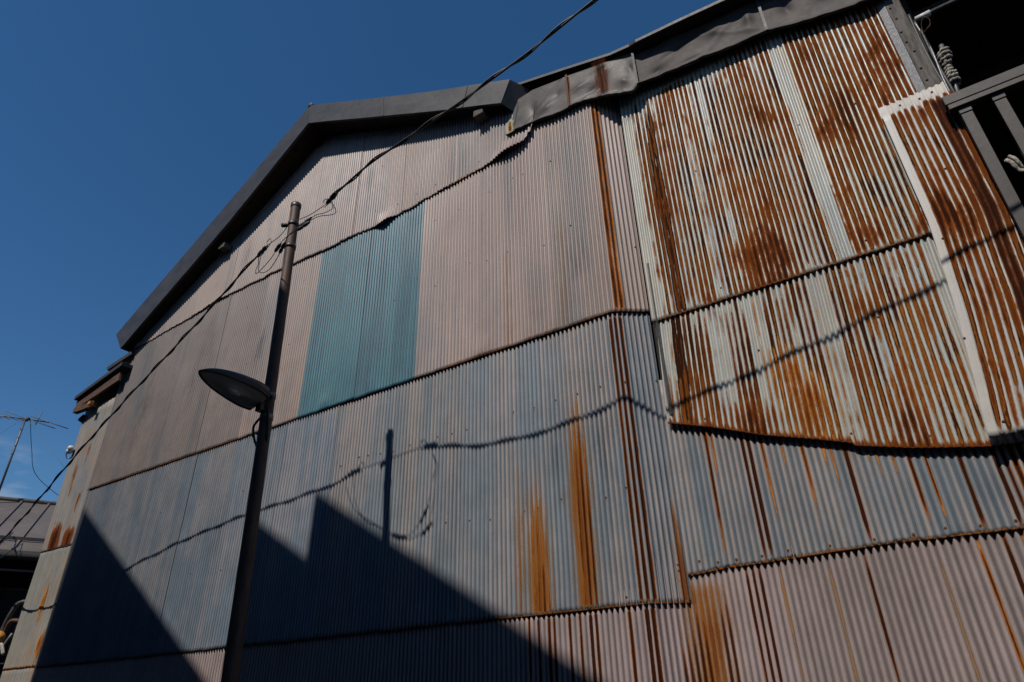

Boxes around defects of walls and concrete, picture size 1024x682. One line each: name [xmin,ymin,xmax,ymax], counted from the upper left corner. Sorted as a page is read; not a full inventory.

rust [47,522,74,550]
rust [443,1,1024,682]